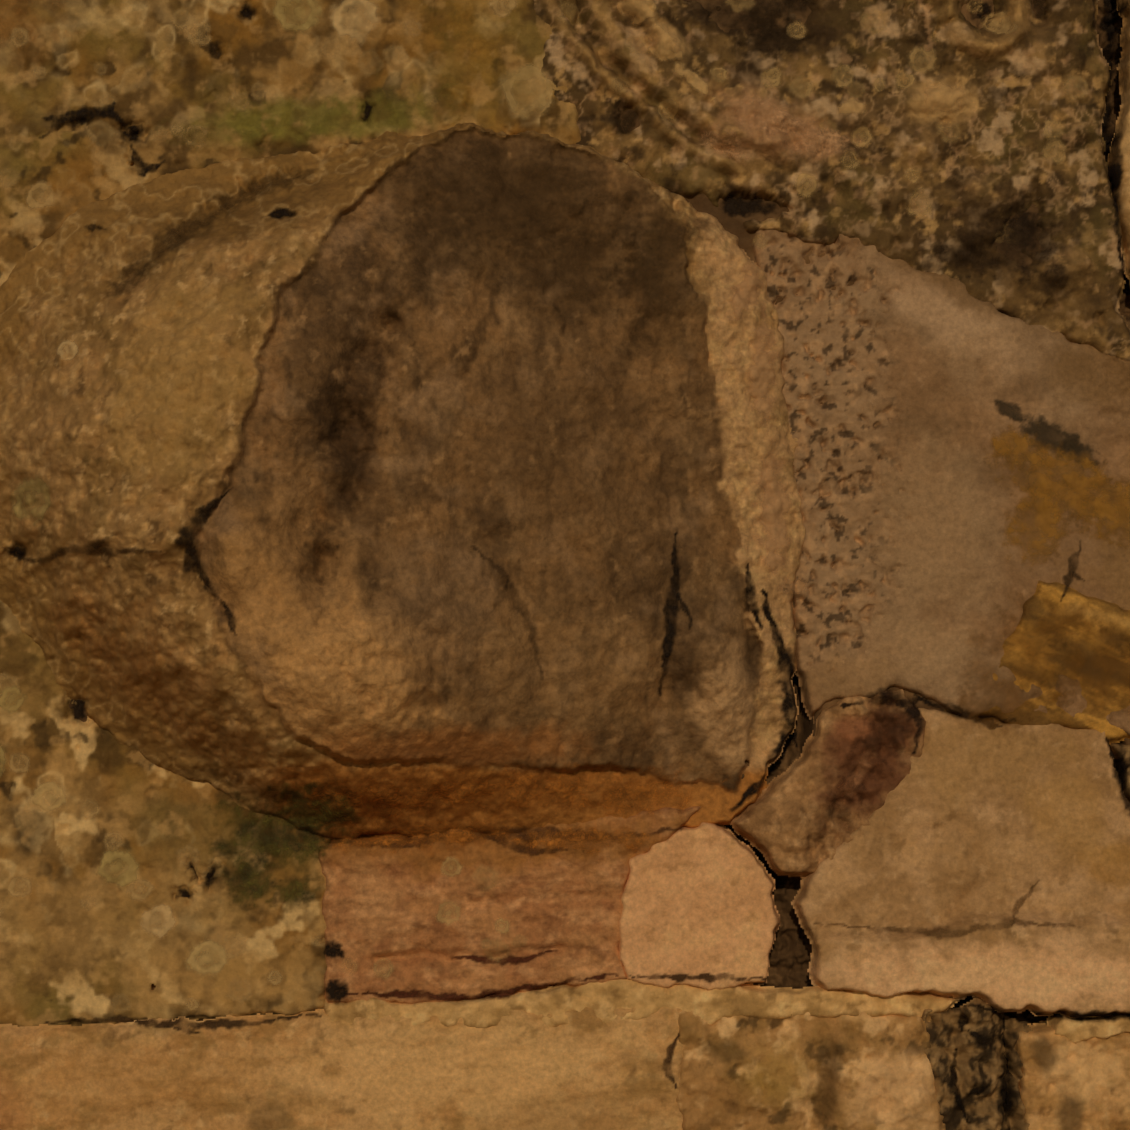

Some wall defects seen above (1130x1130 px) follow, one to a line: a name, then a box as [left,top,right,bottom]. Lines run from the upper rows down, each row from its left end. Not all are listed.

crack [27,490,235,631]